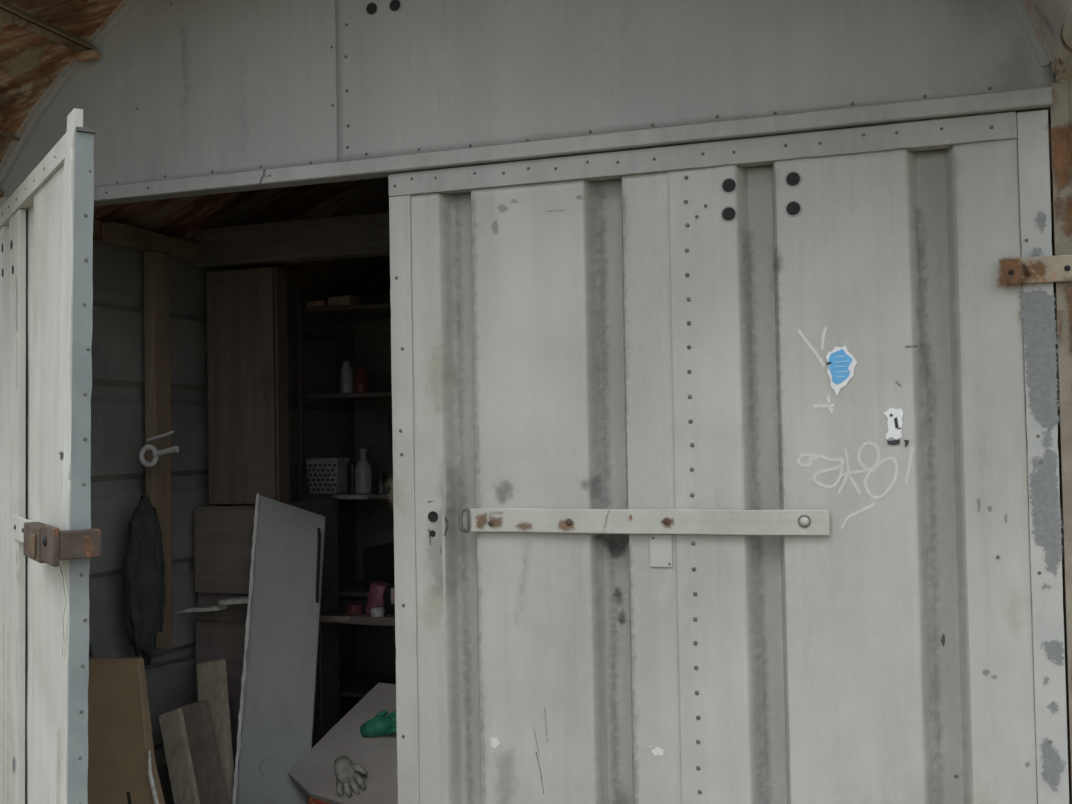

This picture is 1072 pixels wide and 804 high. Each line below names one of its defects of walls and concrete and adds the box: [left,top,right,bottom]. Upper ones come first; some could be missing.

rust [1051,125,1072,236]
rust [998,258,1046,289]
peeling [1019,289,1063,574]
rust [477,514,502,528]
peeling [1042,641,1065,665]
peeling [1041,738,1066,790]